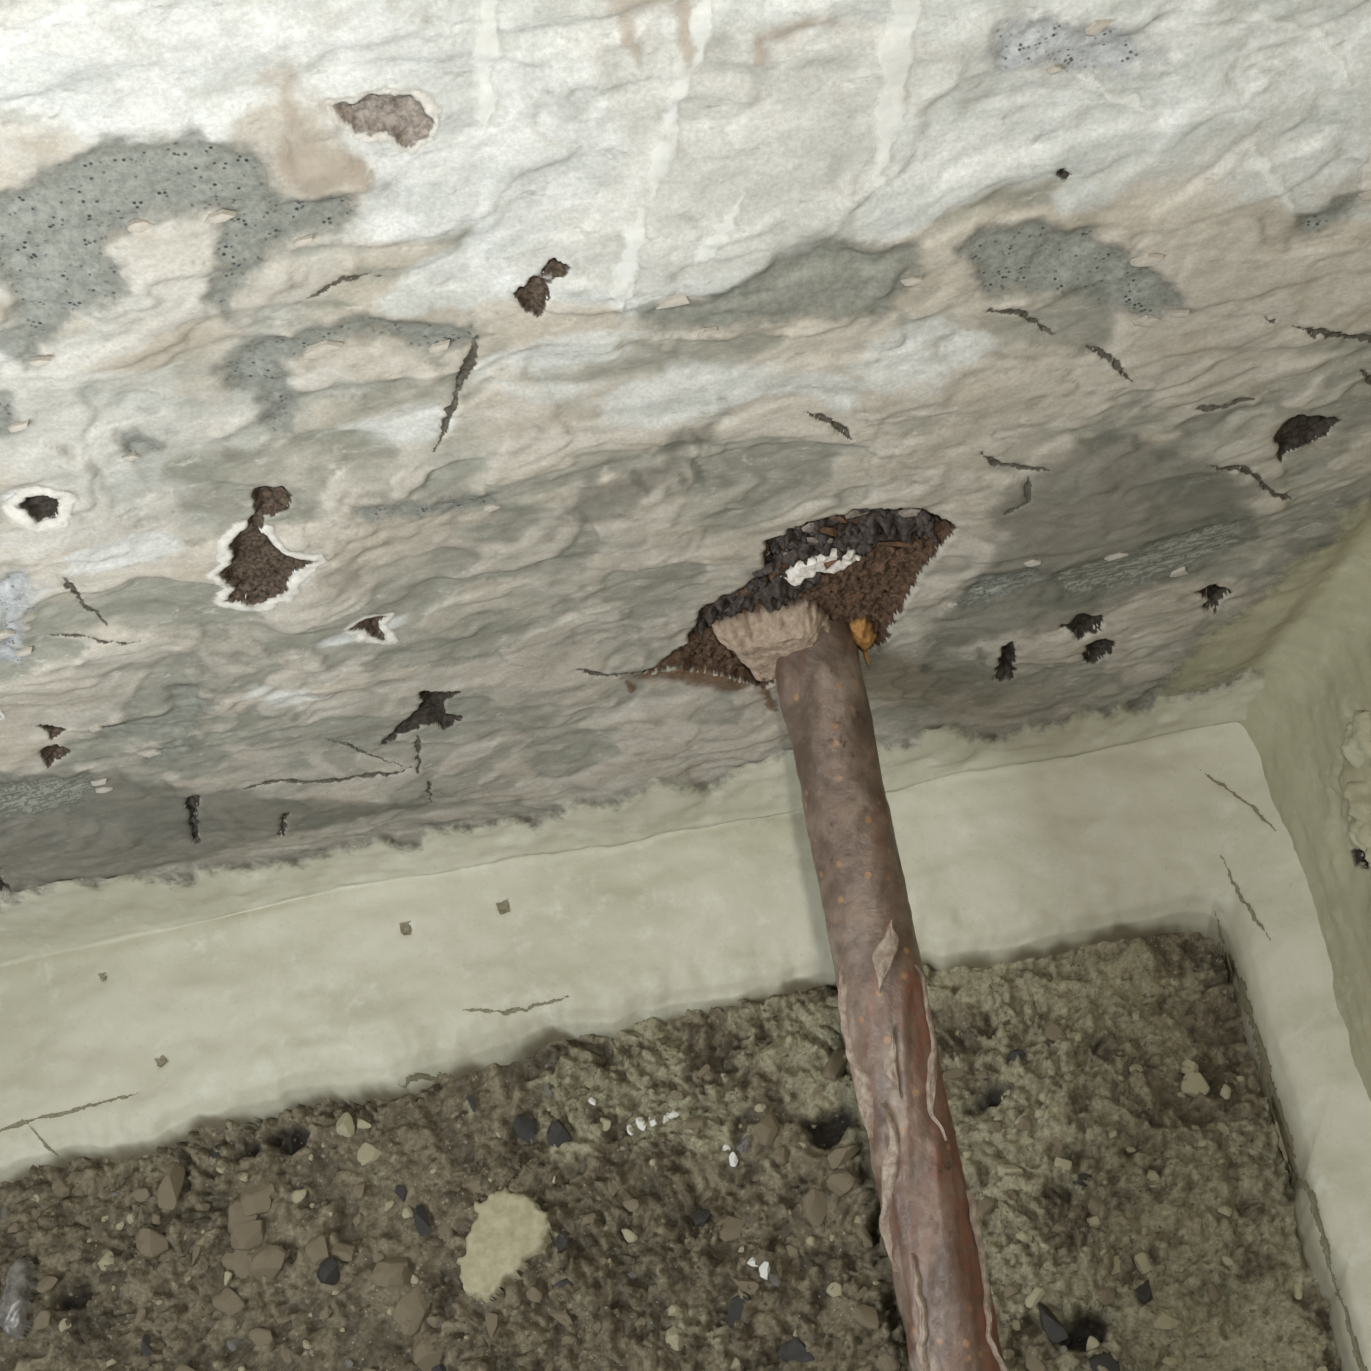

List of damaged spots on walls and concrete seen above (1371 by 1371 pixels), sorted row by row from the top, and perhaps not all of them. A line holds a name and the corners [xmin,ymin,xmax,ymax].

spalling [320,87,441,154]
peeling [1297,144,1371,234]
spalling [513,258,570,318]
crack [433,335,478,452]
spalling [1274,415,1340,462]
spalling [1,486,78,532]
spalling [206,486,328,612]
spalling [643,507,956,689]
spalling [380,690,463,745]